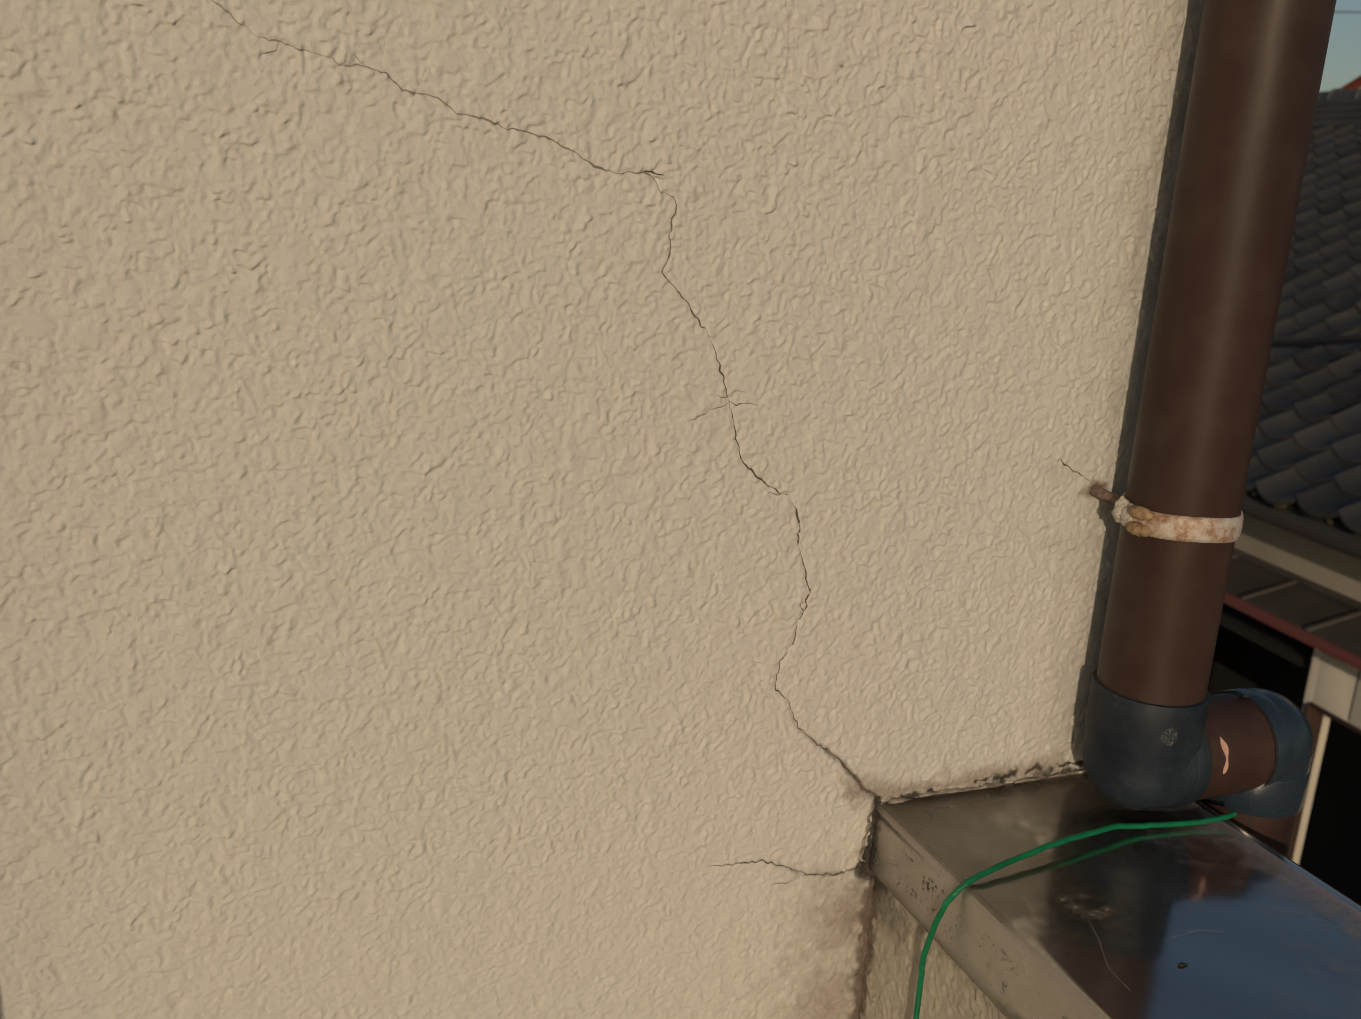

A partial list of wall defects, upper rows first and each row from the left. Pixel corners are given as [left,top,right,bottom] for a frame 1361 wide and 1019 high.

crack [211,0,877,798]
crack [711,859,861,885]